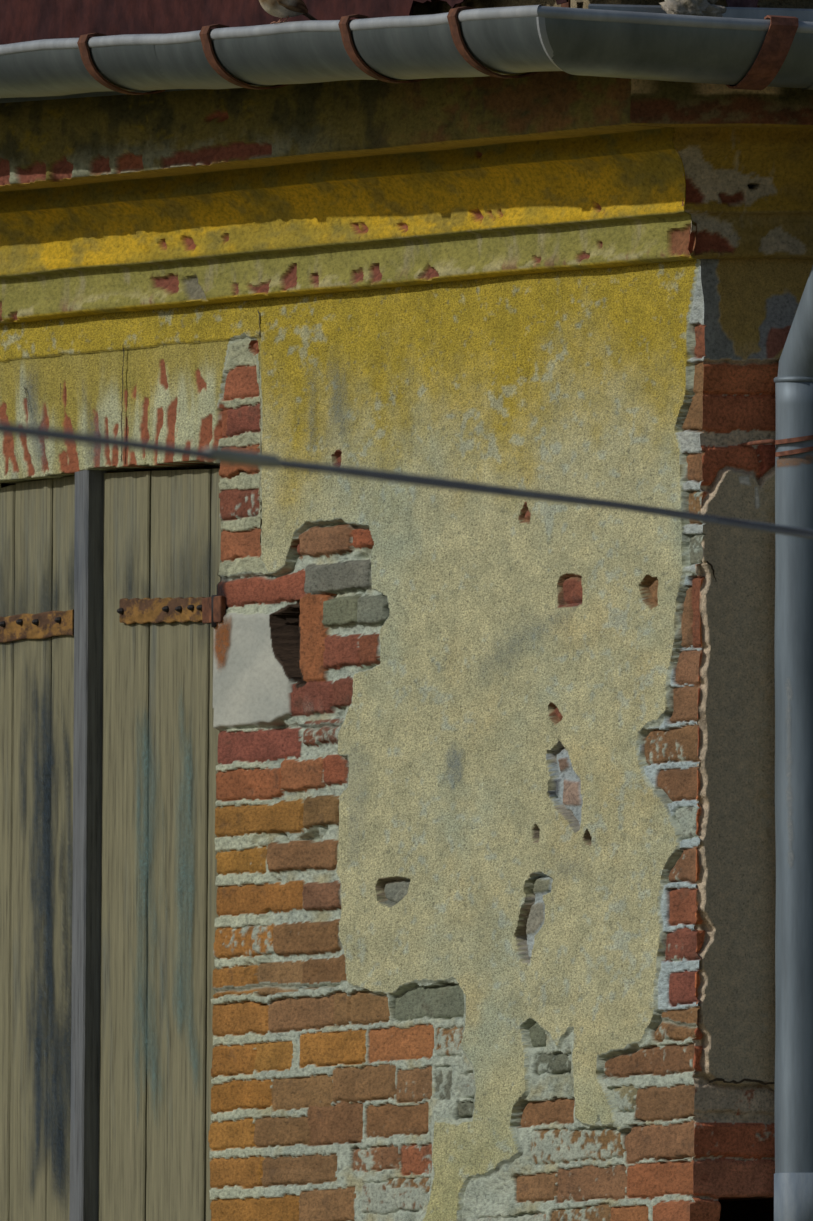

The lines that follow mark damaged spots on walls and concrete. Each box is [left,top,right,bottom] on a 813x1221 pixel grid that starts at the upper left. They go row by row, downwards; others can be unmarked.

spalling [0,333,476,1221]
spalling [456,144,799,1221]
peeling [758,226,808,255]